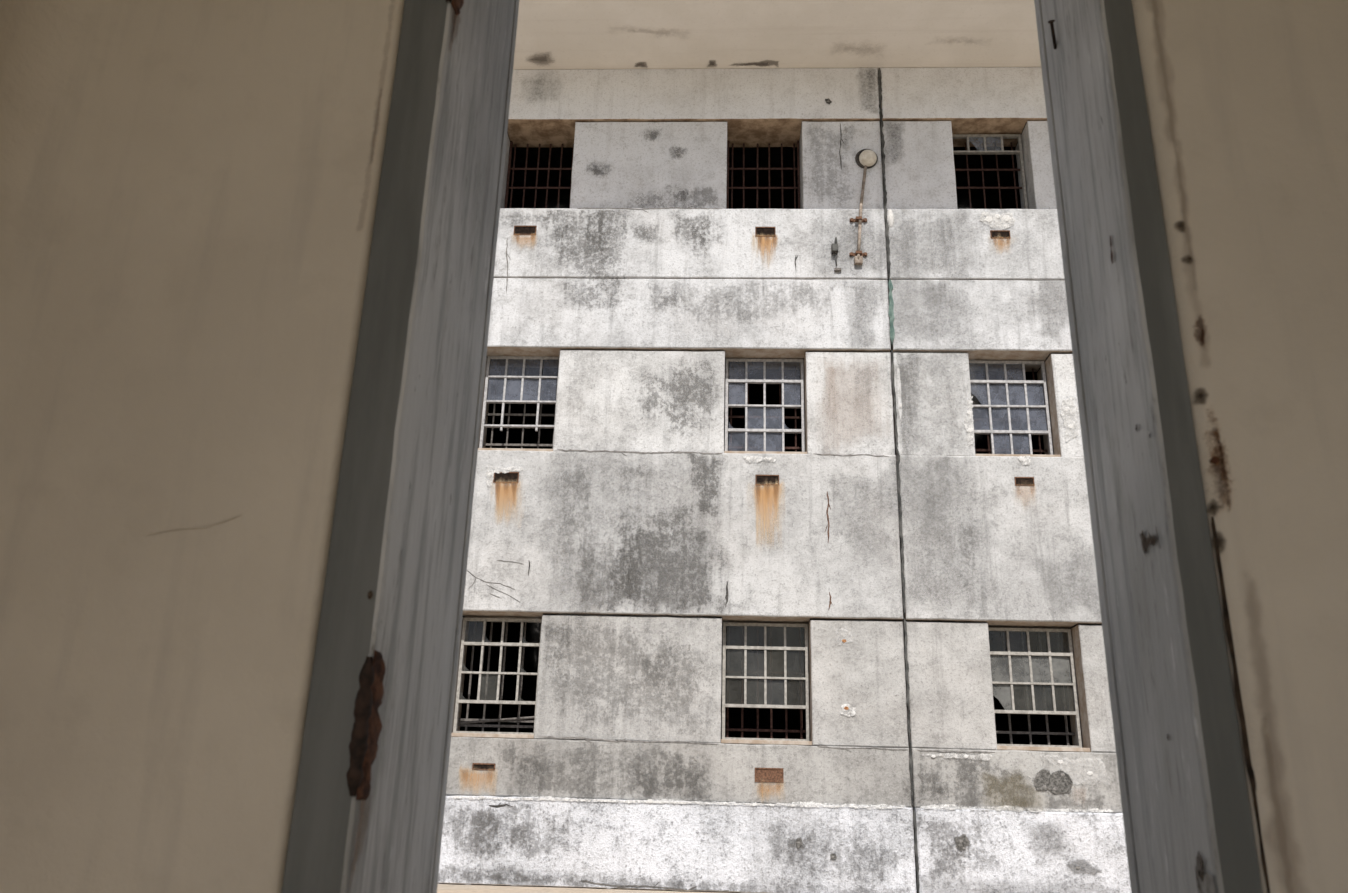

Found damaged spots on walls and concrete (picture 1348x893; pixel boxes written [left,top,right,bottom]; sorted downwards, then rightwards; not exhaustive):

corrosion [758,237,777,254]
corrosion [1195,319,1205,345]
corrosion [1210,418,1230,503]
corrosion [496,483,517,514]
corrosion [755,483,782,533]
peeling [1140,527,1160,554]
peeling [1195,851,1204,893]